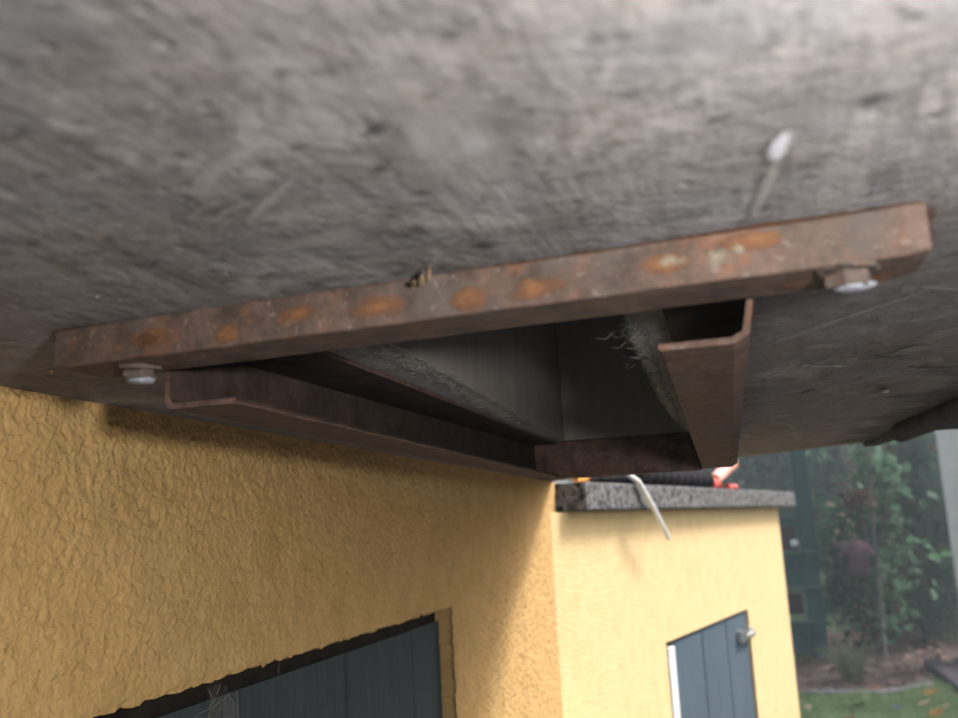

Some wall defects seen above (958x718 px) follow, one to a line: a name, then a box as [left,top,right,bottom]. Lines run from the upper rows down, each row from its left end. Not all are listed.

rust [465,207,885,272]